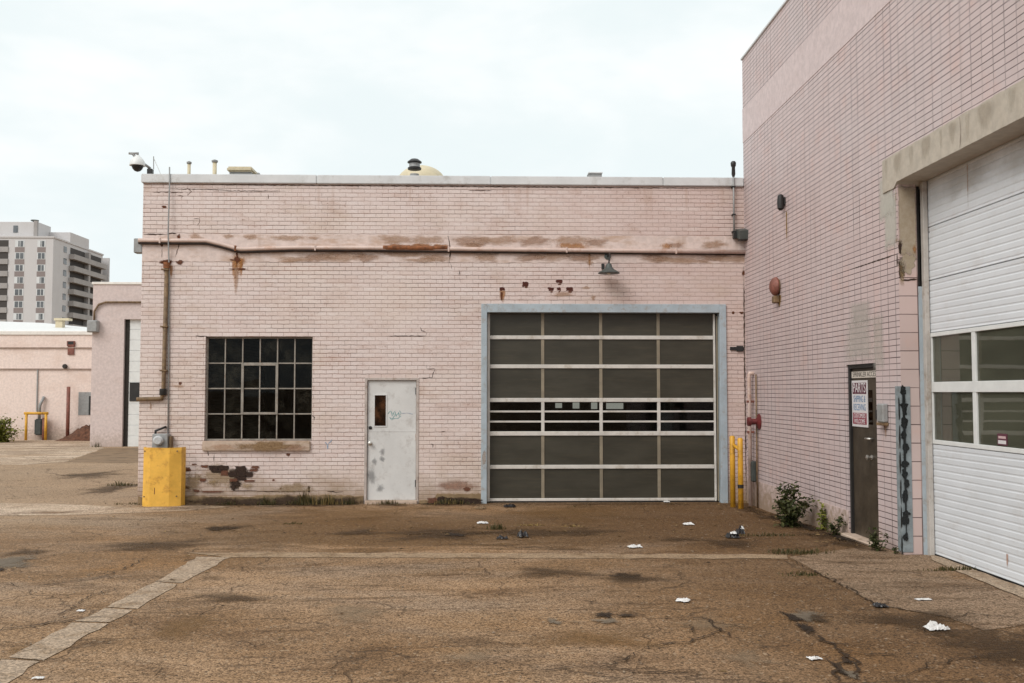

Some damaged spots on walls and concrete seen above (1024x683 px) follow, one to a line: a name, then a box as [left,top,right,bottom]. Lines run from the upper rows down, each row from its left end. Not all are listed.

peeling [895,186,916,281]
corrosion [230,253,245,289]
peeling [548,280,595,300]
peeling [185,464,259,493]